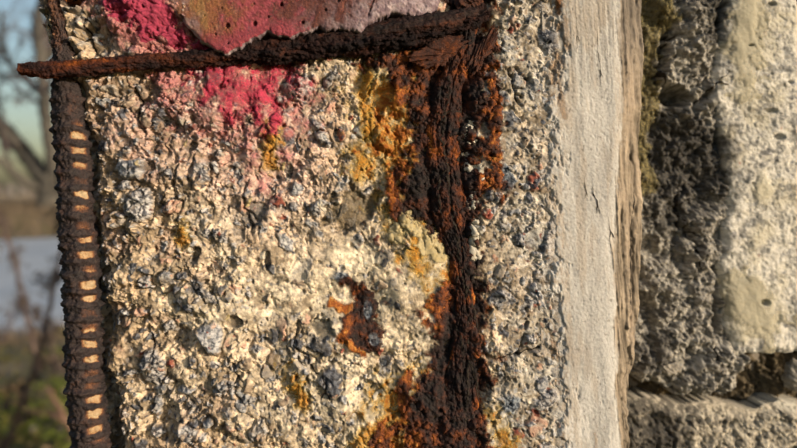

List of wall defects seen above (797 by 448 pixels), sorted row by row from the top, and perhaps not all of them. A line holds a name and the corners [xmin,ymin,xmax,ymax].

spalling [39,0,53,45]
spalling [59,0,198,60]
rust [257,0,377,32]
spalling [437,0,450,12]
rust [475,0,504,47]
rust [263,122,285,169]
spalling [73,44,450,448]
rust [345,41,520,448]
spalling [469,0,566,448]
rust [327,276,387,358]
rust [283,373,309,410]